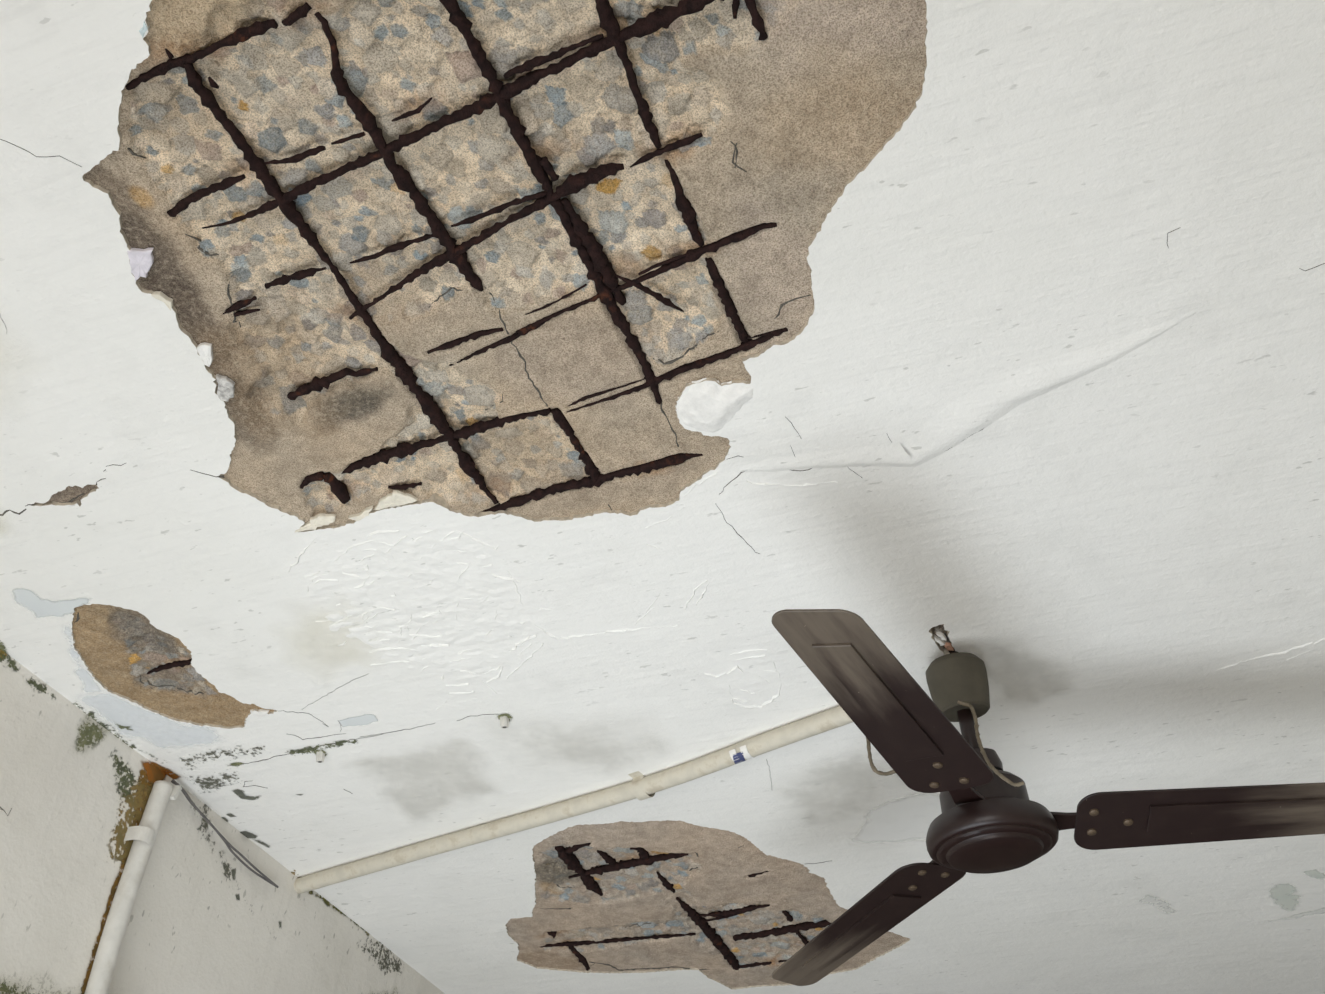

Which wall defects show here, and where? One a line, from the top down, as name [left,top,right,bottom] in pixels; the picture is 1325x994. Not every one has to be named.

crack [0,139,82,167]
spalling [84,0,927,532]
crack [0,504,34,516]
spalling [13,589,274,727]
spalling [506,820,848,988]
spalling [832,931,909,972]
water stain [0,981,27,994]